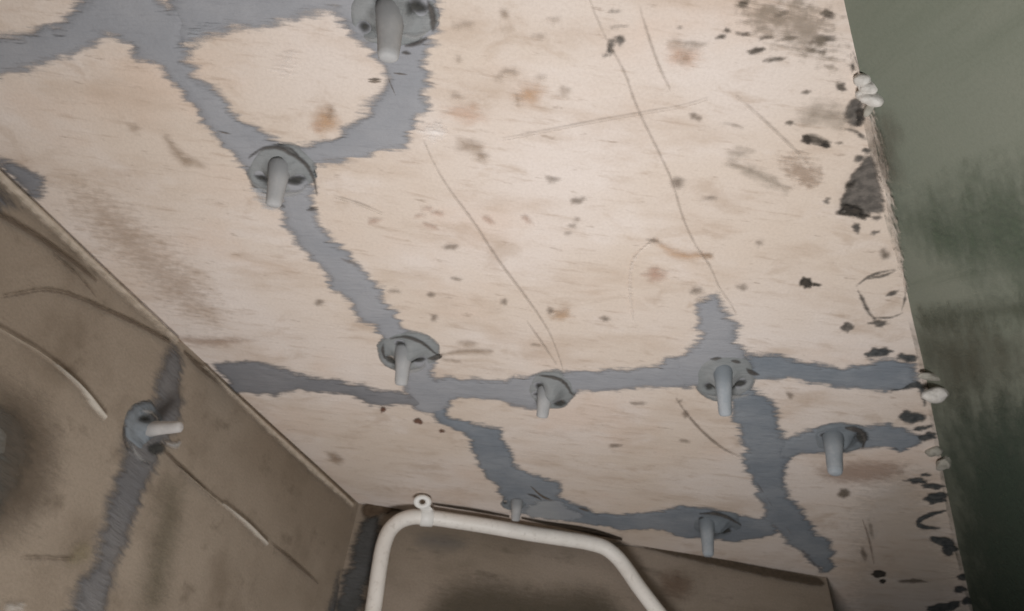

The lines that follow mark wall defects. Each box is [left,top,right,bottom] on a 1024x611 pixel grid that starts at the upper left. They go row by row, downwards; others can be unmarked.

crack [0,0,440,344]
crack [0,159,923,611]